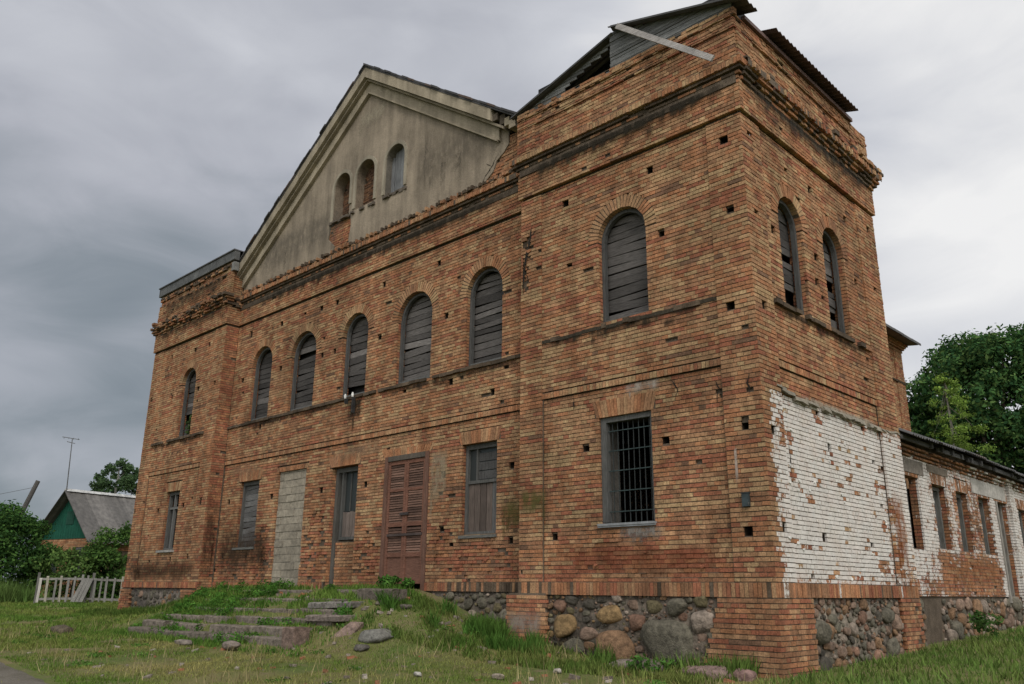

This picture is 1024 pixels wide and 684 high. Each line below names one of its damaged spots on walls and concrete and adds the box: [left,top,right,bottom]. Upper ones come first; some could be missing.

crack [522,227,536,287]
peeling [775,398,794,447]
peeling [789,463,822,507]
peeling [788,536,816,551]
peeling [872,480,908,584]
peeling [942,553,1004,596]